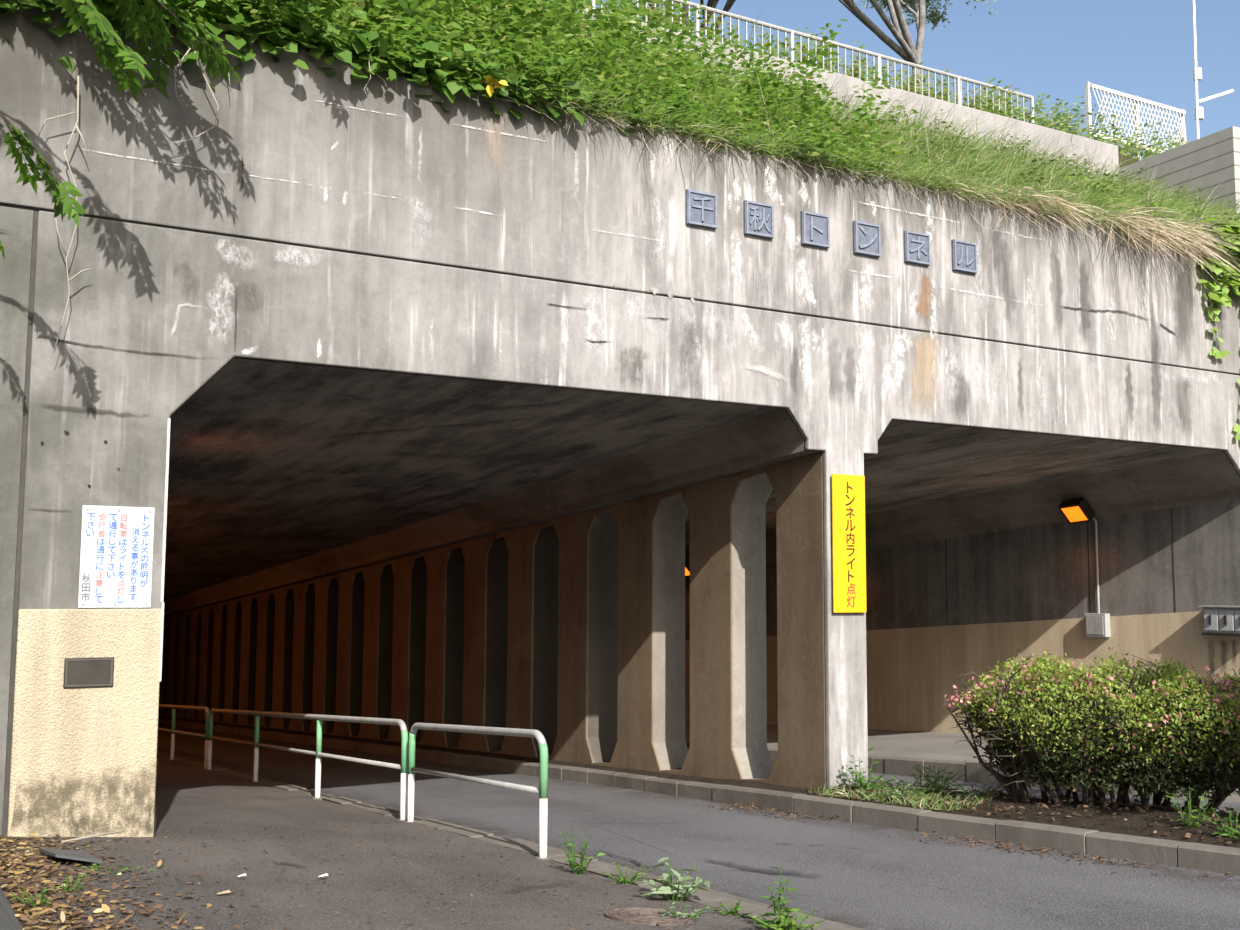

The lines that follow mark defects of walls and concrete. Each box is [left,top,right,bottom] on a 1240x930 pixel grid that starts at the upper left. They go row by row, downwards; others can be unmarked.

leakage [764,165,795,247]
leakage [732,234,742,282]
leakage [797,260,816,304]
rust [918,278,932,317]
leakage [977,230,1010,308]
leakage [1053,254,1062,317]
leakage [1080,266,1089,325]
crack [1064,306,1175,335]
leakage [1179,281,1193,341]
leakage [779,321,825,384]
leakage [882,333,910,398]
leakage [1153,333,1162,402]